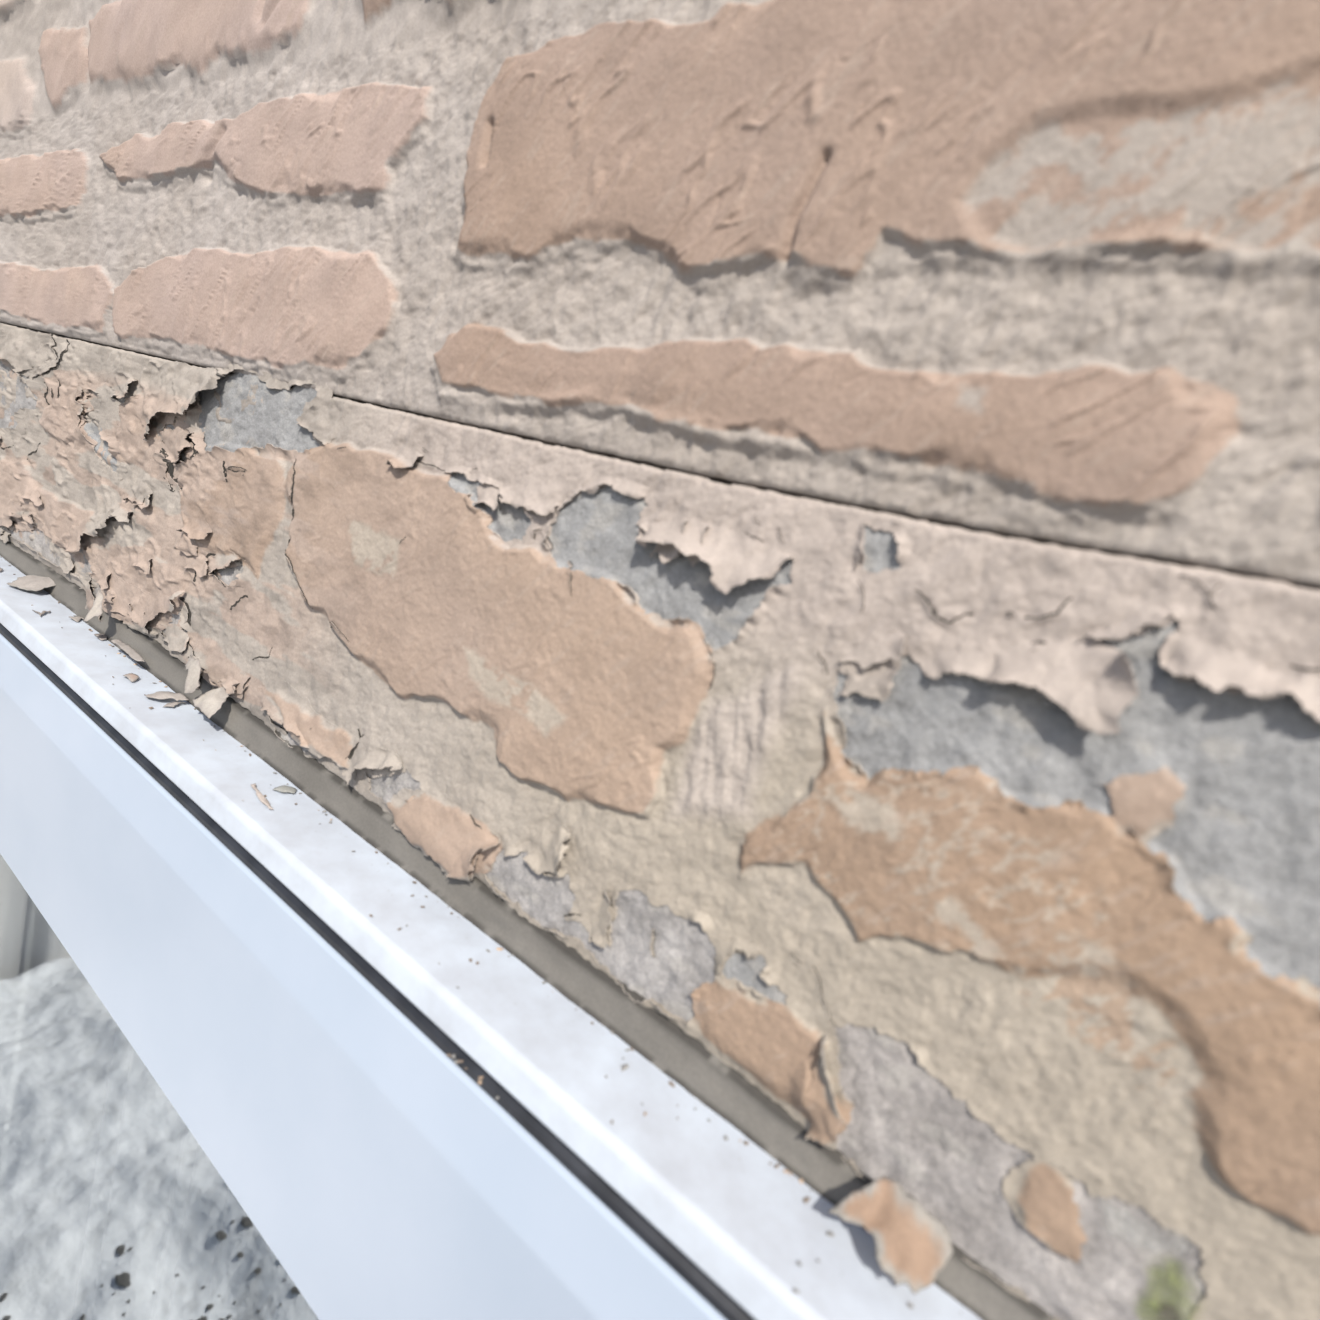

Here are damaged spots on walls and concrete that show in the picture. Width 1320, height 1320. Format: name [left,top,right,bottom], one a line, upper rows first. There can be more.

peeling [0,323,51,439]
crack [24,333,70,405]
crack [0,443,44,461]
crack [154,440,246,492]
crack [284,459,349,643]
crack [174,553,250,688]
crack [252,647,274,663]
peeling [0,361,801,1032]
peeling [823,602,1320,1023]
peeling [798,1015,1226,1320]